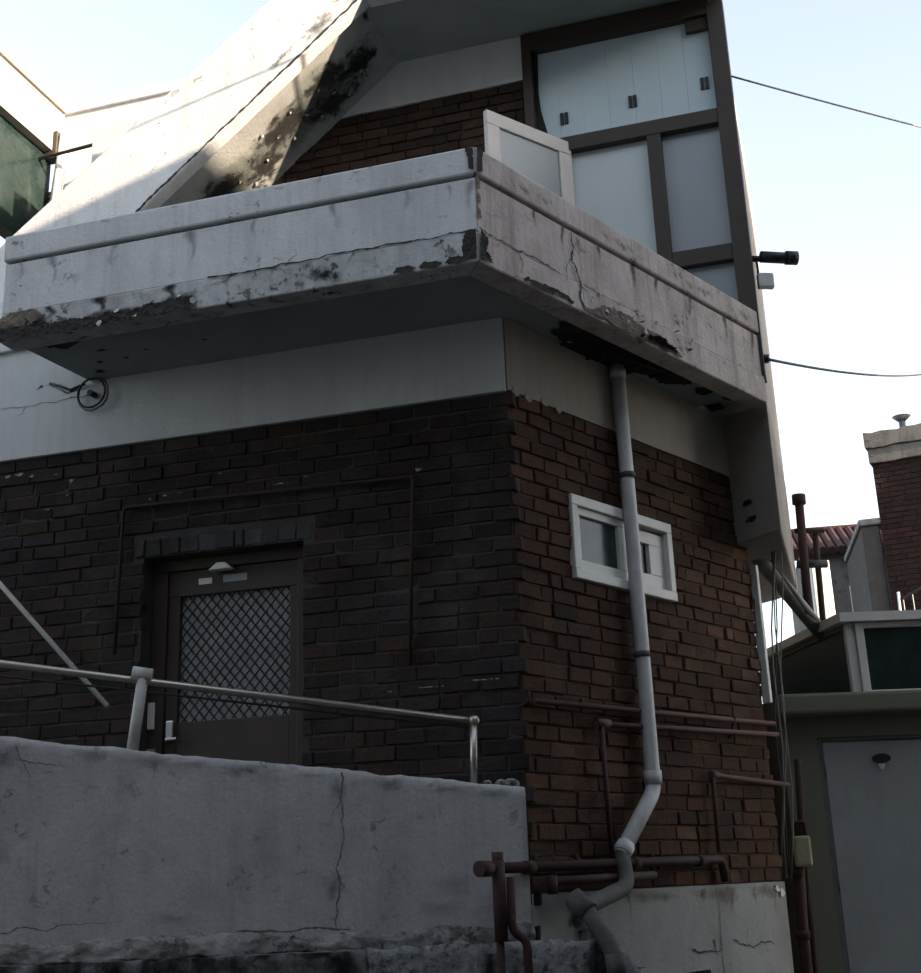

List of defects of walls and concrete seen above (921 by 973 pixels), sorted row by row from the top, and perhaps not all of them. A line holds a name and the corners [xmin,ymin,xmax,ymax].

peeling [294,263,338,286]
spalling [0,294,197,349]